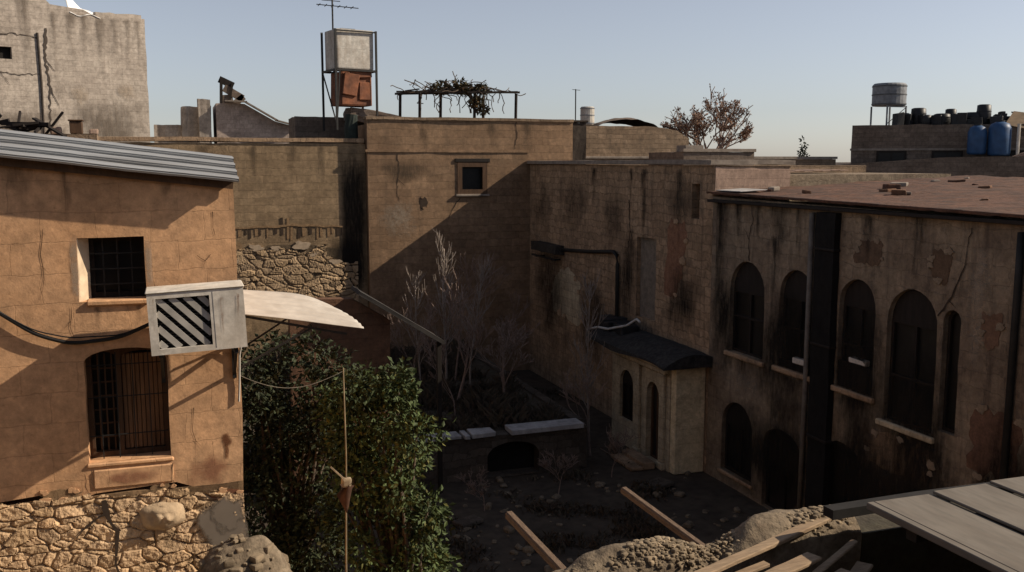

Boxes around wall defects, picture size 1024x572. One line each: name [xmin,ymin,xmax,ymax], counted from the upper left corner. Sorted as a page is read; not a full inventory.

crack [0,28,59,125]
leakage [336,165,364,293]
crack [937,228,972,316]
flaking render [966,404,1024,481]